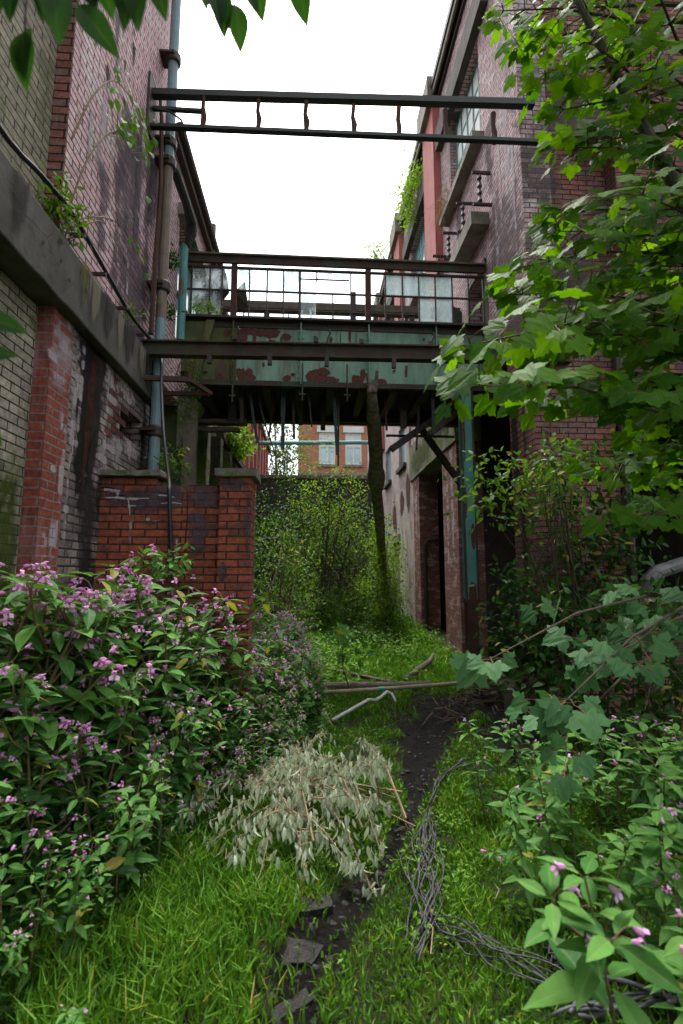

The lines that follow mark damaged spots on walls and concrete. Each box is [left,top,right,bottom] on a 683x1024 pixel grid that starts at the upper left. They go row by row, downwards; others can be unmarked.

water stain [43,322,85,557]
spalling [105,376,129,443]
water stain [106,369,134,413]
water stain [96,419,147,516]